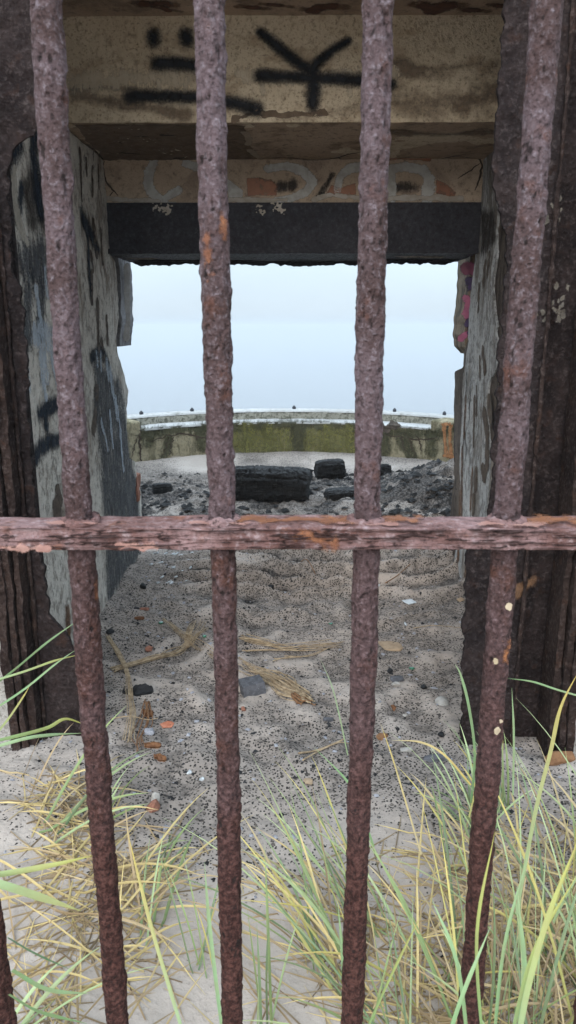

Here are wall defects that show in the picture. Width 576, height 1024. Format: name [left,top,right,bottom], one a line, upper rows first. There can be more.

spalling [227,108,328,160]
spalling [76,124,197,202]
rust [203,216,227,264]
leakage [233,418,355,453]
leakage [381,422,454,459]